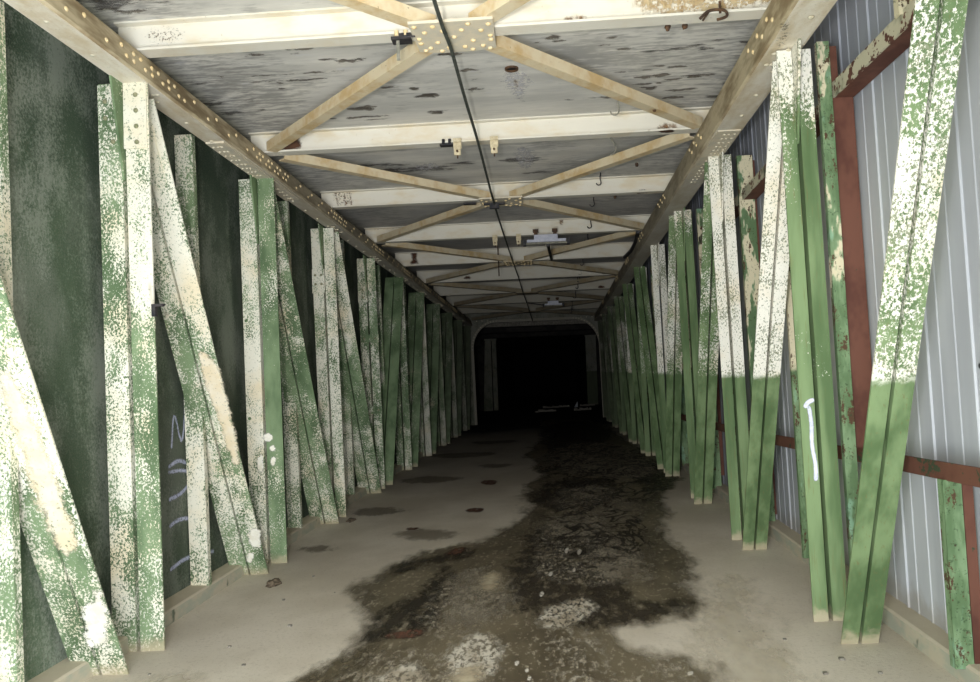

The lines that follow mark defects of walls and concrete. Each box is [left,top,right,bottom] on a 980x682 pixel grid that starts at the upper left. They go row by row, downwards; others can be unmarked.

peeling [0,370,77,556]
peeling [81,590,109,647]
water stain [296,419,712,682]